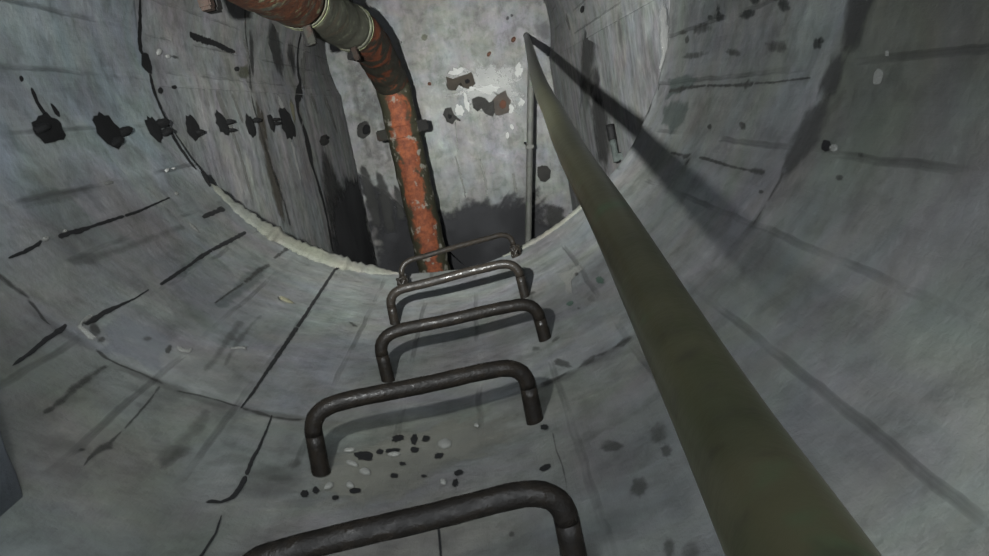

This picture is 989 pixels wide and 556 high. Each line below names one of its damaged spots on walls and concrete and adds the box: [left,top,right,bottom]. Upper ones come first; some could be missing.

water stain [844,0,872,46]
peeling [443,107,461,124]
peeling [446,72,514,139]
water stain [439,62,564,270]
water stain [783,105,825,172]
water stain [820,55,843,94]
crack [8,197,170,258]
crack [202,206,225,218]
crack [241,33,339,408]
water stain [322,151,419,274]
crack [12,231,246,366]
crack [199,415,272,556]